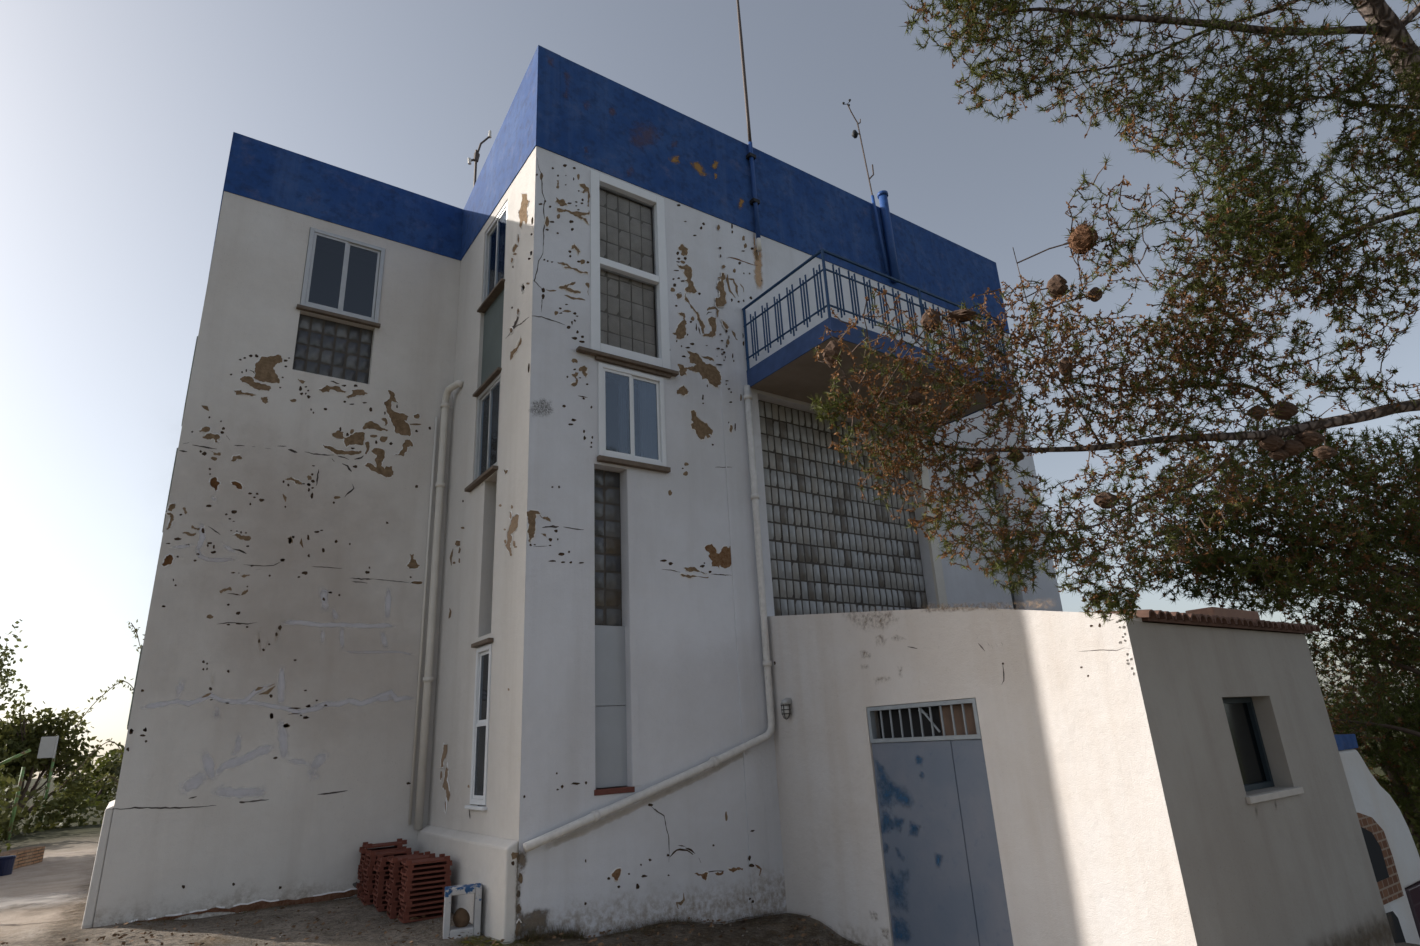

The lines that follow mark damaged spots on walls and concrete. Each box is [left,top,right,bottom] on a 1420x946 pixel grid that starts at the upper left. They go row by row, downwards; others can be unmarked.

peeling [510,164,590,343]
rust [754,238,762,287]
peeling [670,204,763,446]
peeling [230,354,431,478]
peeling [562,359,593,448]
peeling [191,405,264,547]
peeling [165,503,205,540]
peeling [280,530,351,578]
peeling [499,504,551,556]
peeling [660,543,732,579]
peeling [607,859,651,889]
peeling [670,845,762,881]